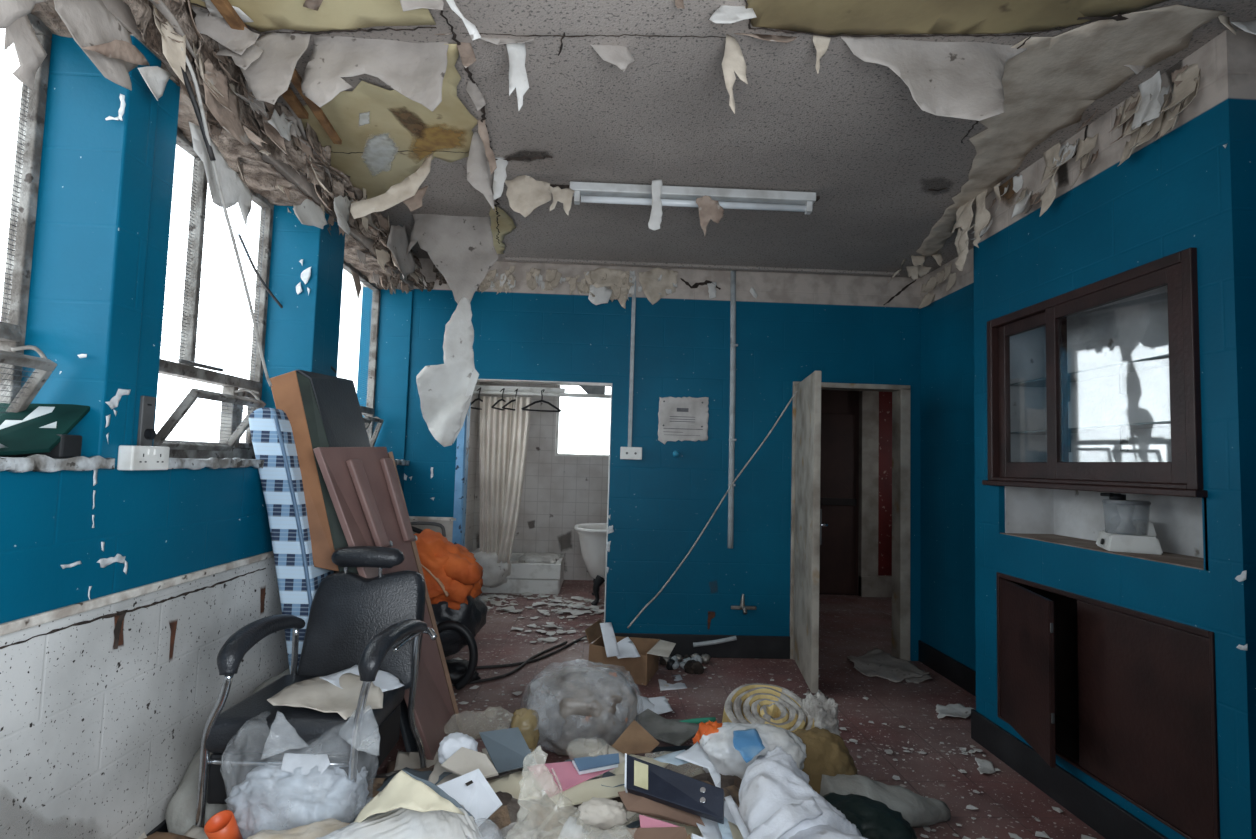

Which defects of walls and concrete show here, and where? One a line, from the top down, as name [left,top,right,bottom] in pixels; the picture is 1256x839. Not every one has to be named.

damp [390,109,464,160]
peeling [884,4,1256,309]
flaking render [0,0,723,447]
peeling [97,542,128,574]
corrosion [113,609,128,649]
corrosion [169,620,178,660]